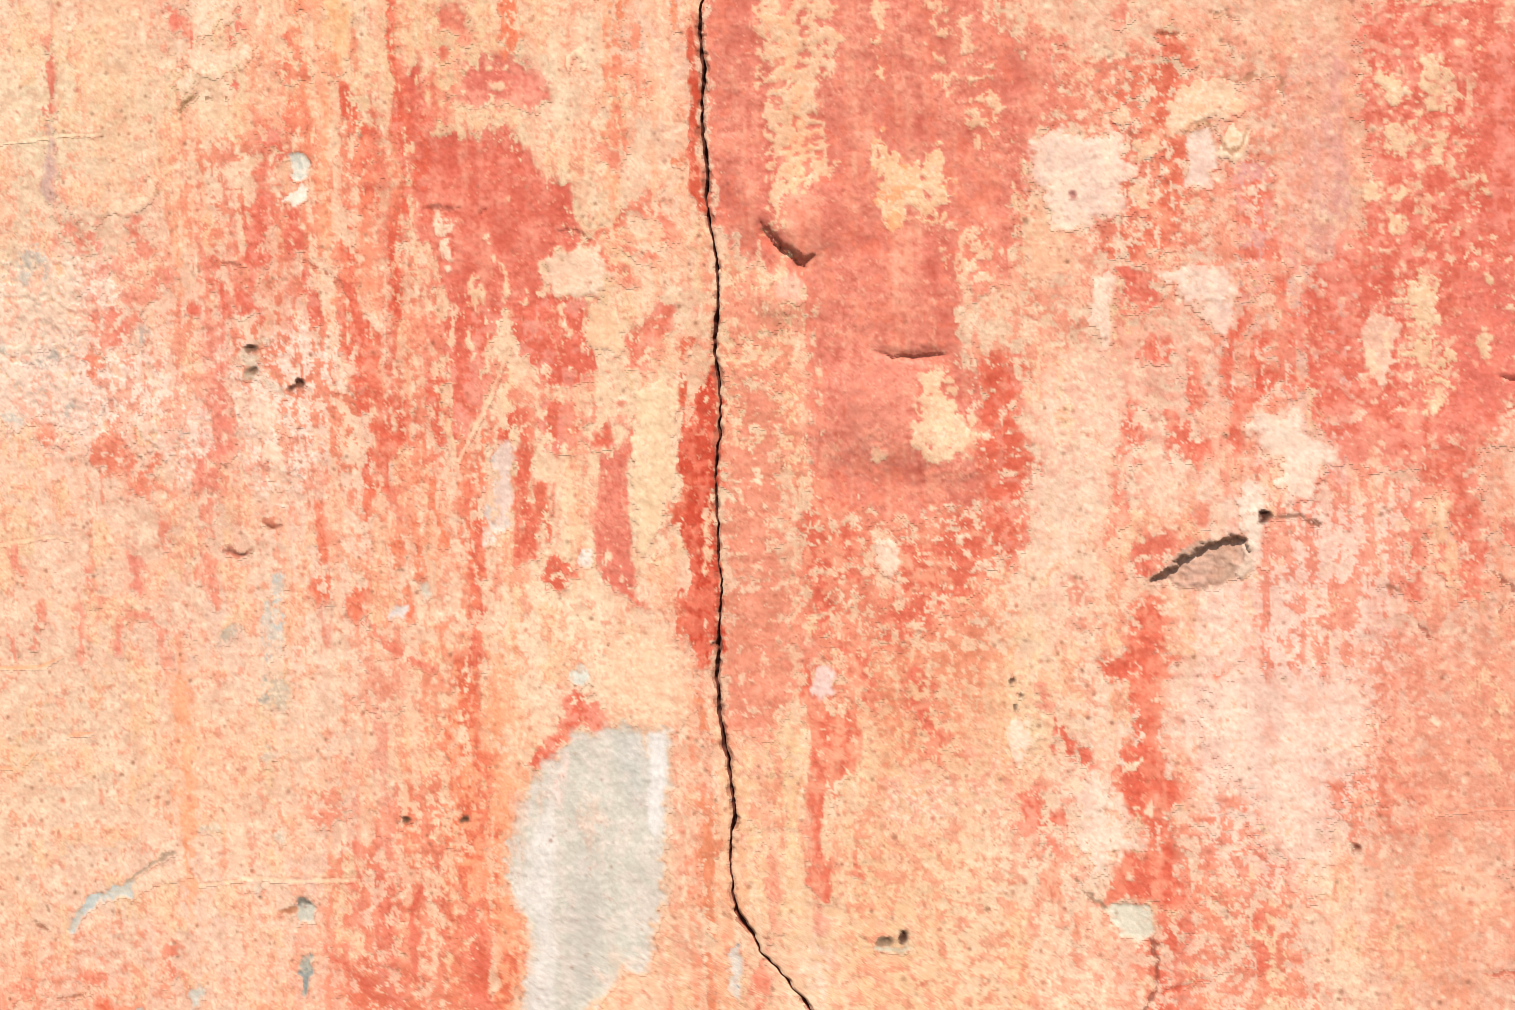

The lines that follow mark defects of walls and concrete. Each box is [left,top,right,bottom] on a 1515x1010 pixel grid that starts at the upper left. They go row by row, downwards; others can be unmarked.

crack [695,0,814,1010]
flaking render [67,851,194,935]
flaking render [500,663,680,1010]
peeling [1033,478,1261,1010]
peeling [1230,909,1276,980]